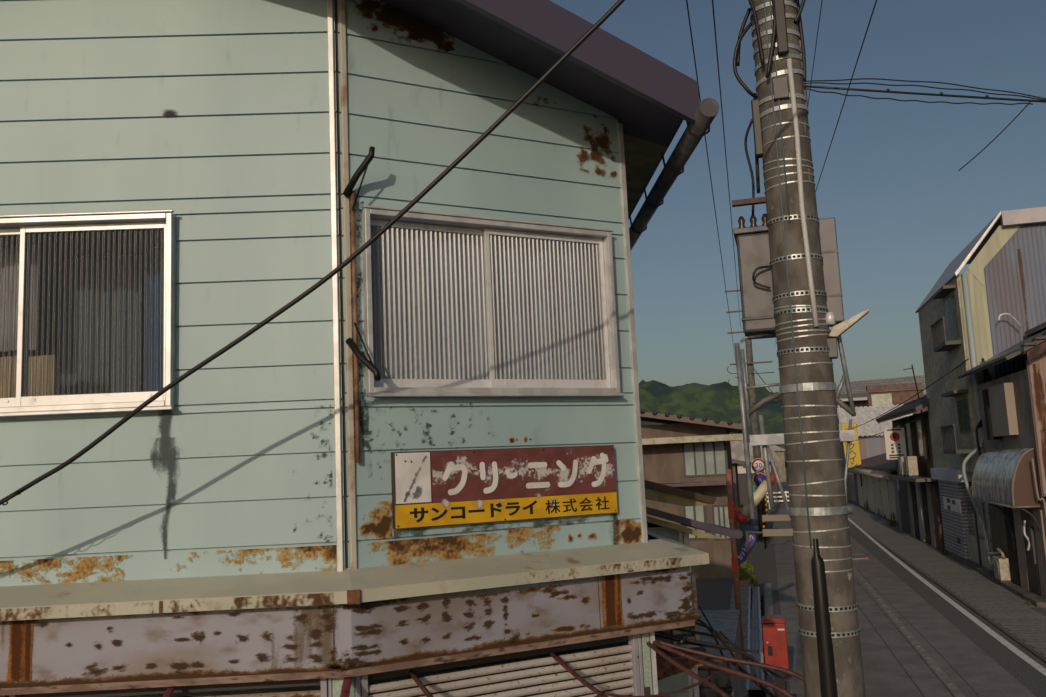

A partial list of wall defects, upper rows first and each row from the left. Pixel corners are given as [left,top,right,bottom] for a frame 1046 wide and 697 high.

corrosion [577,115,617,177]
water stain [151,410,177,559]
corrosion [1033,364,1046,477]
corrosion [0,557,701,688]